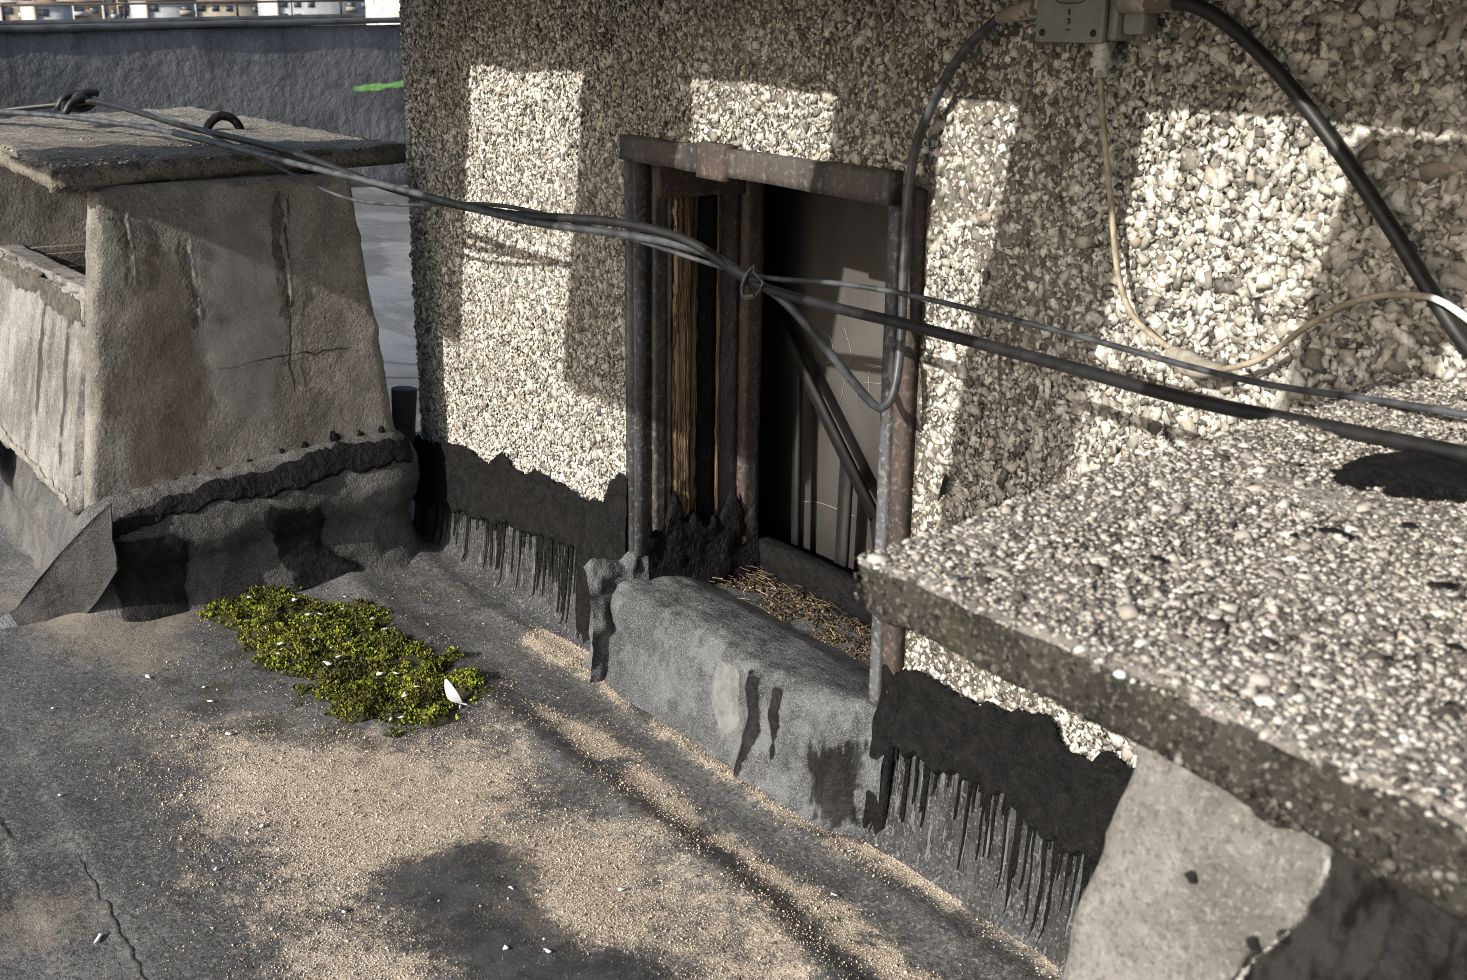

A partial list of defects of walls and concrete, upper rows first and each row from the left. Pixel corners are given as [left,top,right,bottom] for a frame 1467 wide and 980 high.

crack [217,195,347,393]
crack [76,855,146,980]